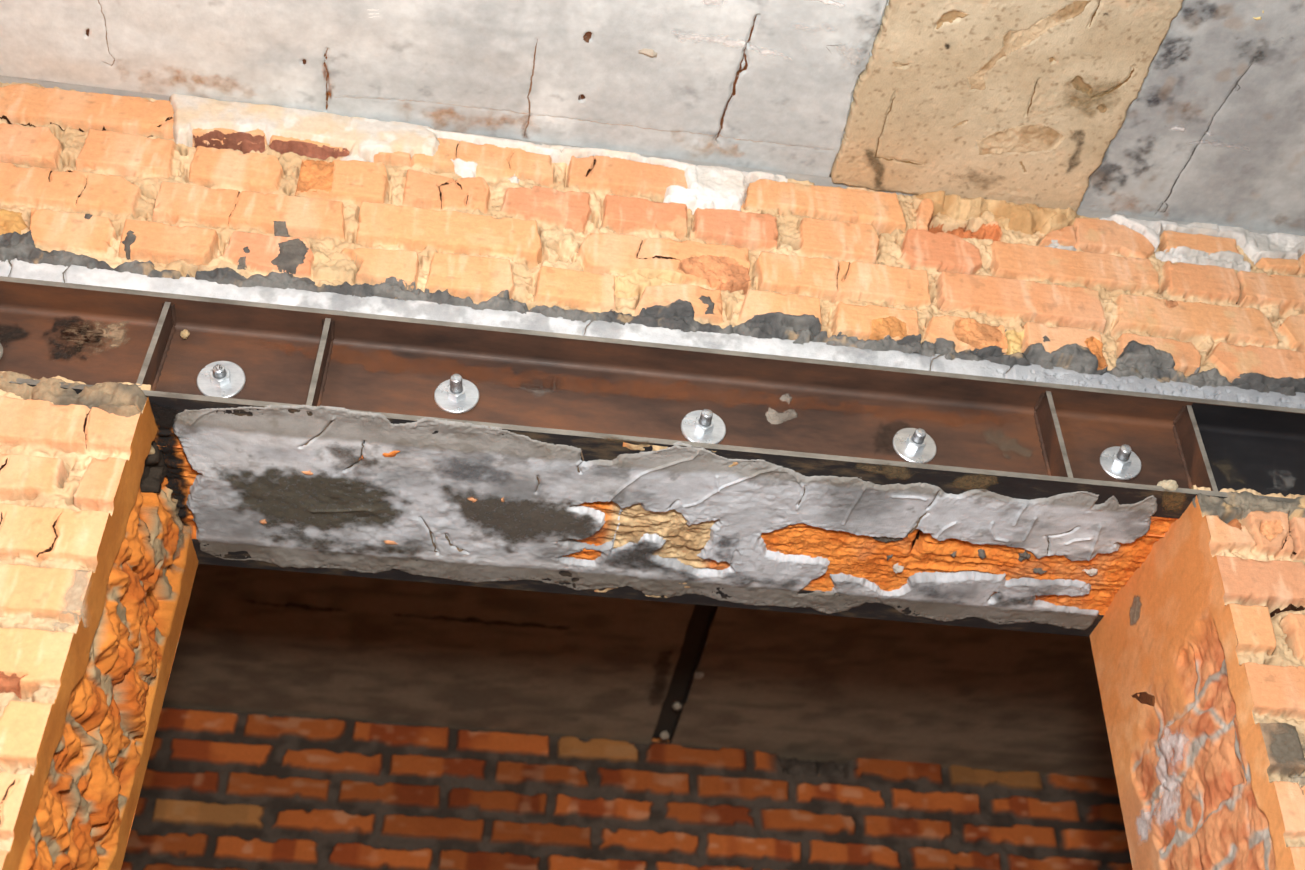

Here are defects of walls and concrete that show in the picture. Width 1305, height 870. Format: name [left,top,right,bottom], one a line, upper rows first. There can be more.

crack [98,0,115,66]
crack [324,15,835,152]
crack [439,144,468,209]
crack [1157,59,1254,212]
crack [37,513,62,557]
damp [225,448,418,555]
damp [443,458,596,552]
spalling [1131,692,1155,706]